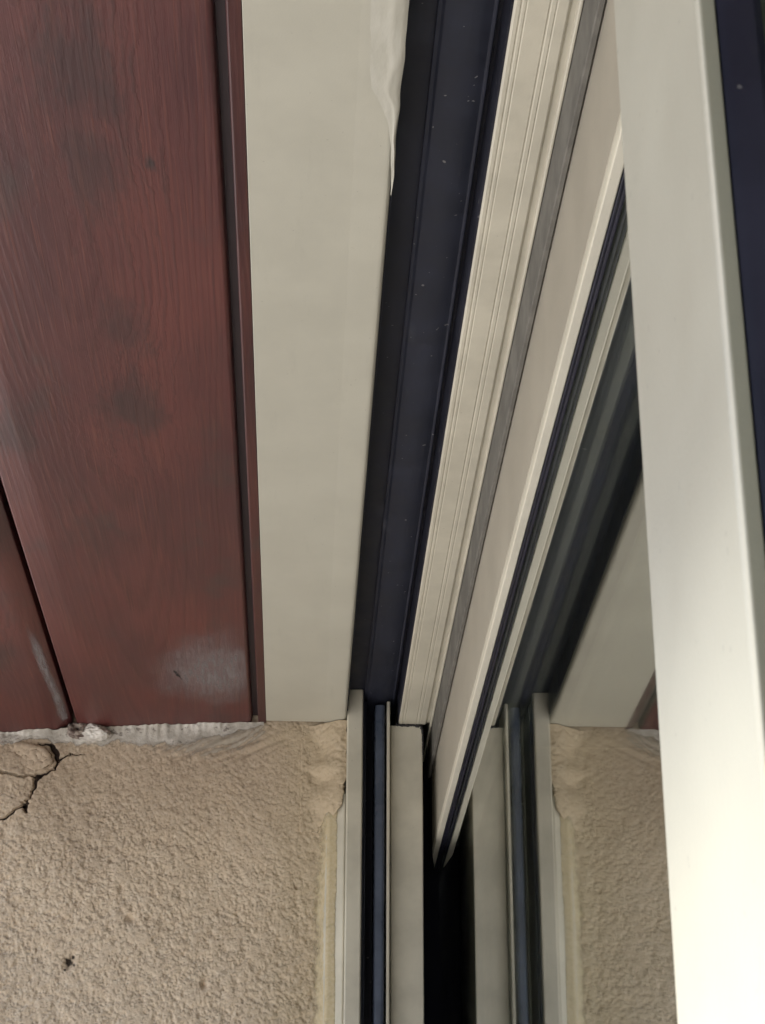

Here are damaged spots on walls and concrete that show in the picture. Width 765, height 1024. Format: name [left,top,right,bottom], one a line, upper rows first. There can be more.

crack [0,741,85,820]